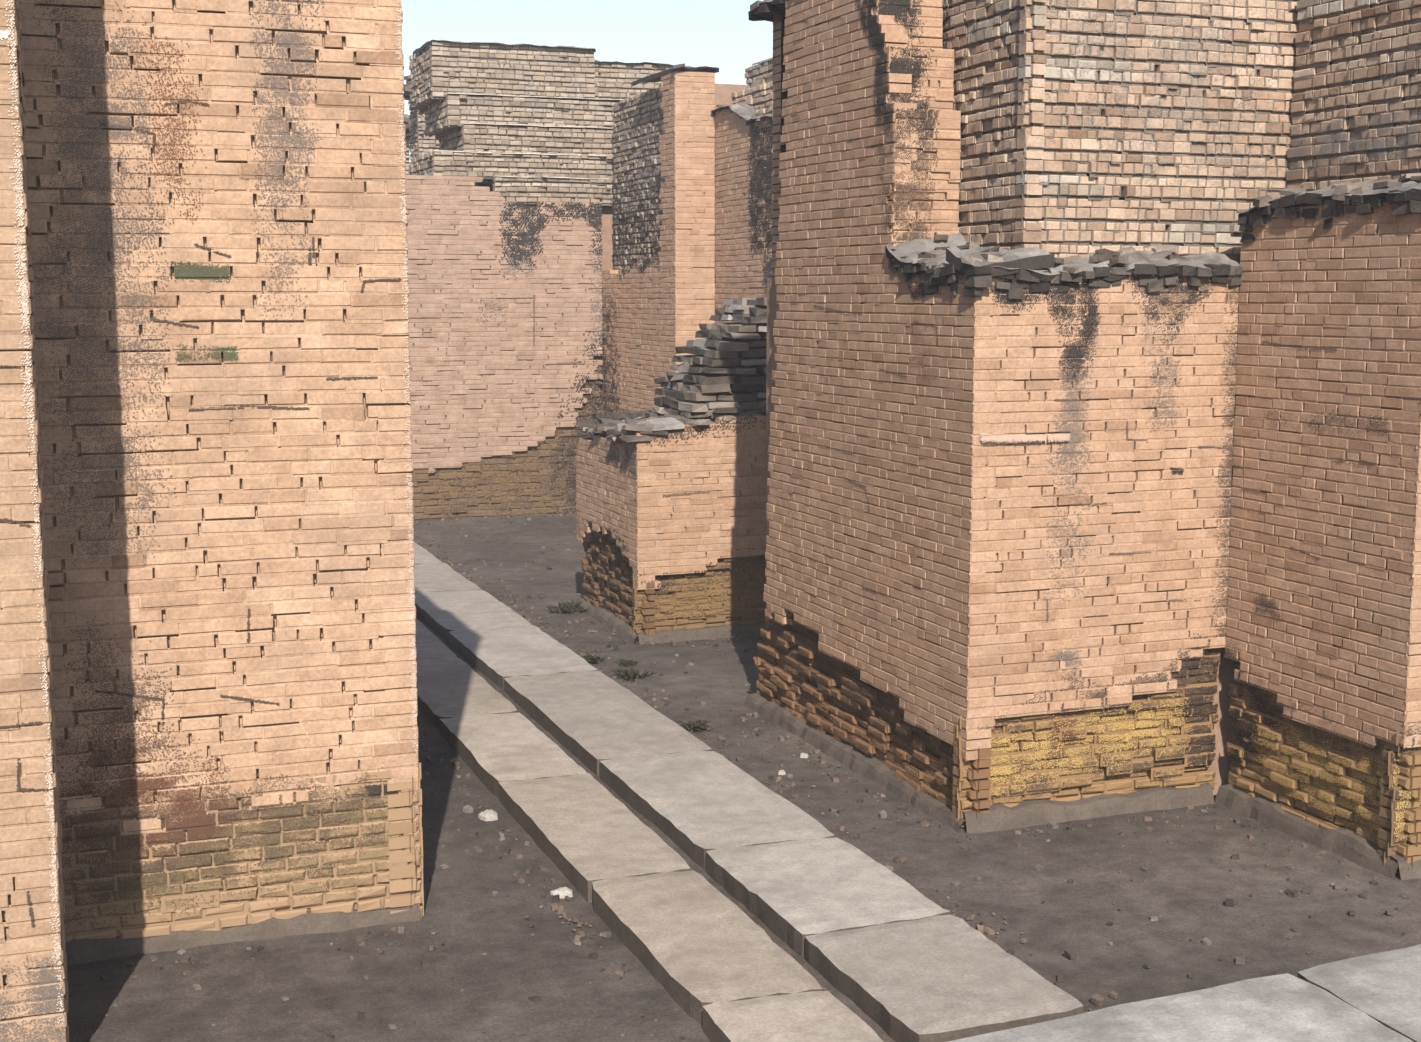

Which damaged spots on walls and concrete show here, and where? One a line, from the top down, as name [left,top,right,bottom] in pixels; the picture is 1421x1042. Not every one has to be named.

damp [580,520,766,623]
damp [774,273,1421,842]
damp [59,616,386,937]